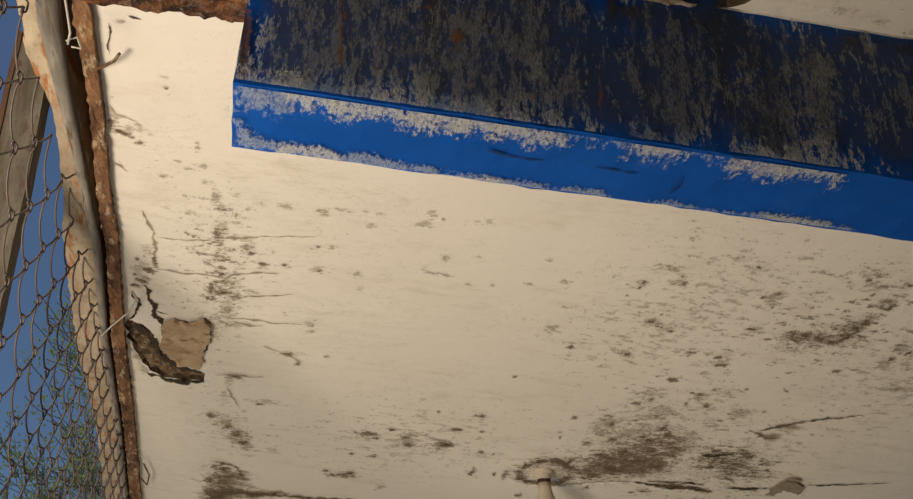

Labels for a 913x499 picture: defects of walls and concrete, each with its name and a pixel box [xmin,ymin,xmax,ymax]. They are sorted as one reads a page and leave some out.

spalling [647,0,697,8]
flaking render [126,319,212,385]
crack [751,415,859,440]
water stain [493,415,782,497]
crack [635,481,767,494]
peeling [766,478,806,496]
crack [809,481,885,489]